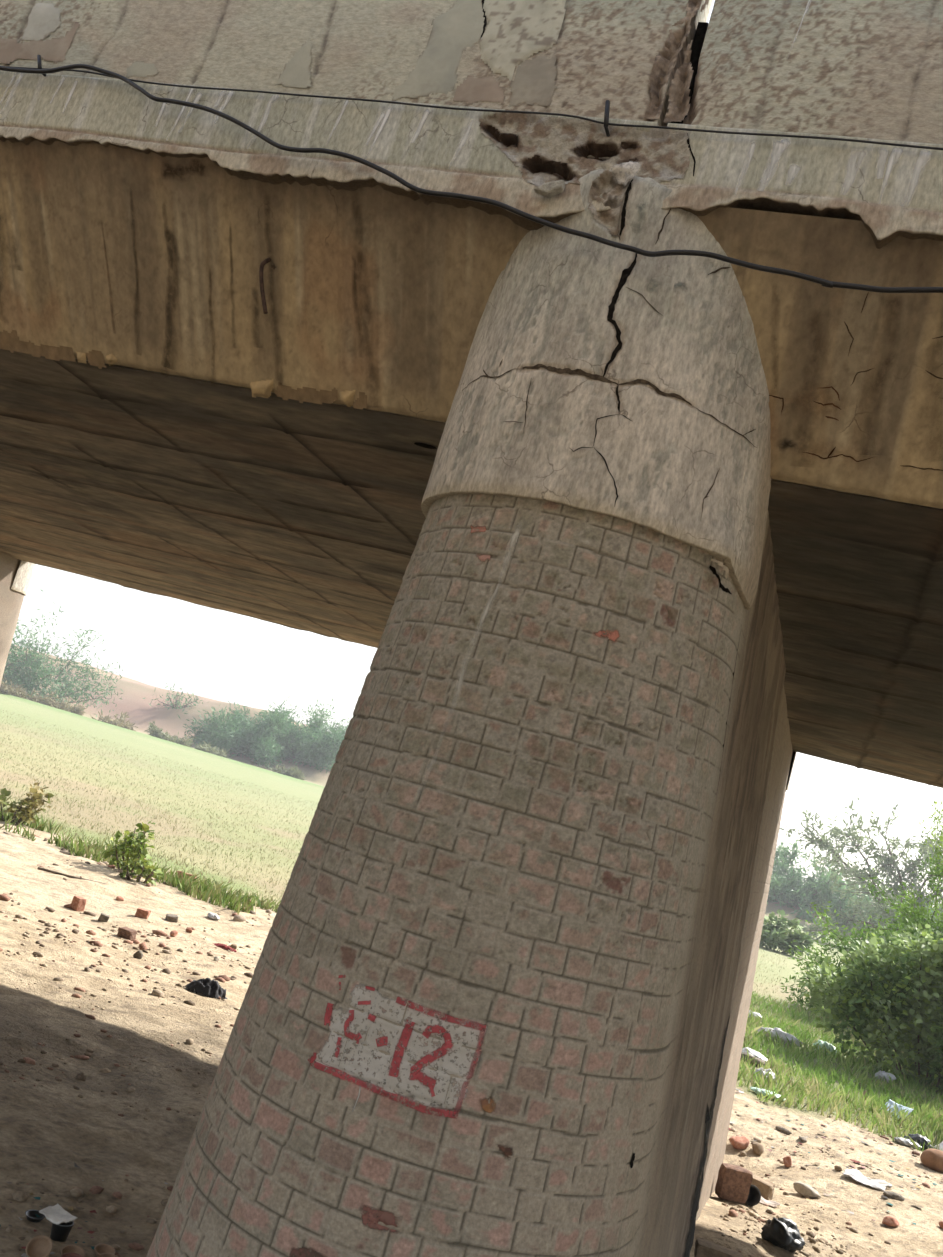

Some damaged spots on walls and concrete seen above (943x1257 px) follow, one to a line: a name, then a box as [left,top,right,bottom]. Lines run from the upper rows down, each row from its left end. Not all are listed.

peeling [0,3,80,64]
spalling [392,0,709,237]
crack [687,133,696,176]
crack [463,179,756,507]
crack [804,292,874,462]
crack [701,470,719,516]
crack [905,464,943,472]